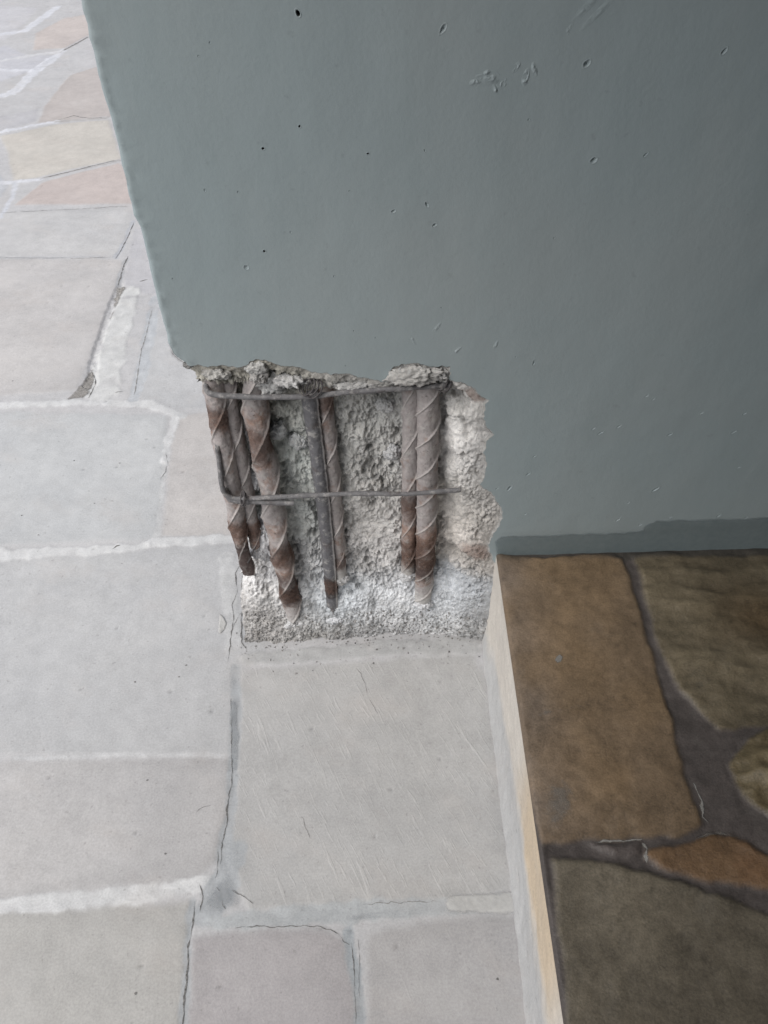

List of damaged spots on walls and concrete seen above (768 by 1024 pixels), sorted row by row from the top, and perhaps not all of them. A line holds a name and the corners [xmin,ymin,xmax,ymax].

corrosion [207,409,228,429]
spalling [183,359,513,644]
corrosion [400,496,417,519]
corrosion [228,520,262,541]
corrosion [400,540,436,568]
corrosion [279,581,300,602]